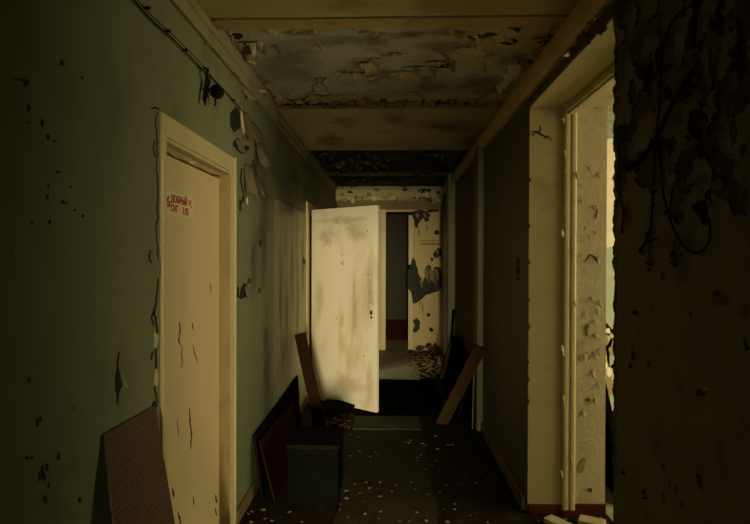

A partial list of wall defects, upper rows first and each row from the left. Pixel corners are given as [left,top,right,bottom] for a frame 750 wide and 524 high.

peeling [229,33,283,59]
peeling [243,29,553,113]
peeling [230,106,271,211]
peeling [313,150,464,236]
peeling [407,248,442,304]
peeling [563,0,750,524]
peeling [115,364,123,400]